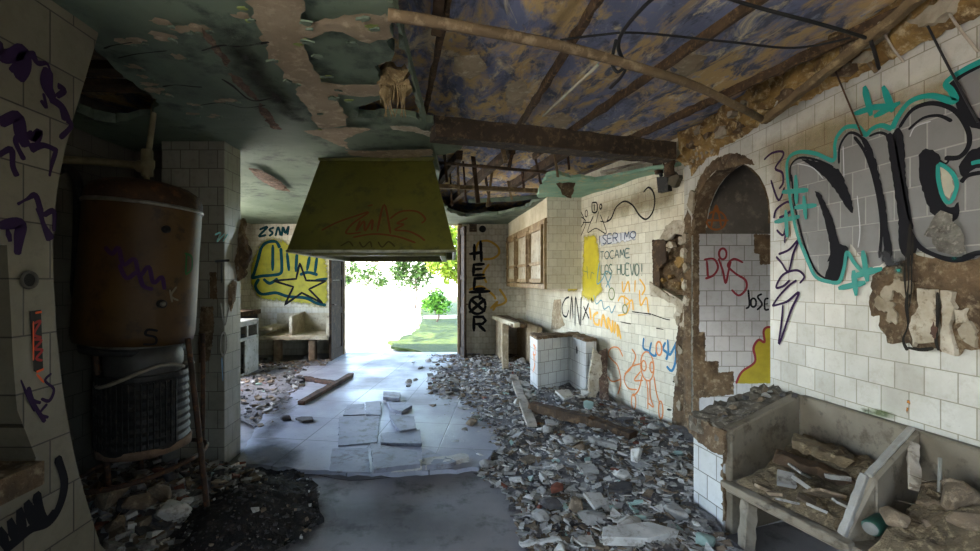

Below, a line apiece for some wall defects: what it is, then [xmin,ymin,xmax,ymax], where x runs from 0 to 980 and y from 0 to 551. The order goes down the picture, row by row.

peeling [114,17,282,130]
peeling [230,0,433,159]
spalling [649,0,980,536]